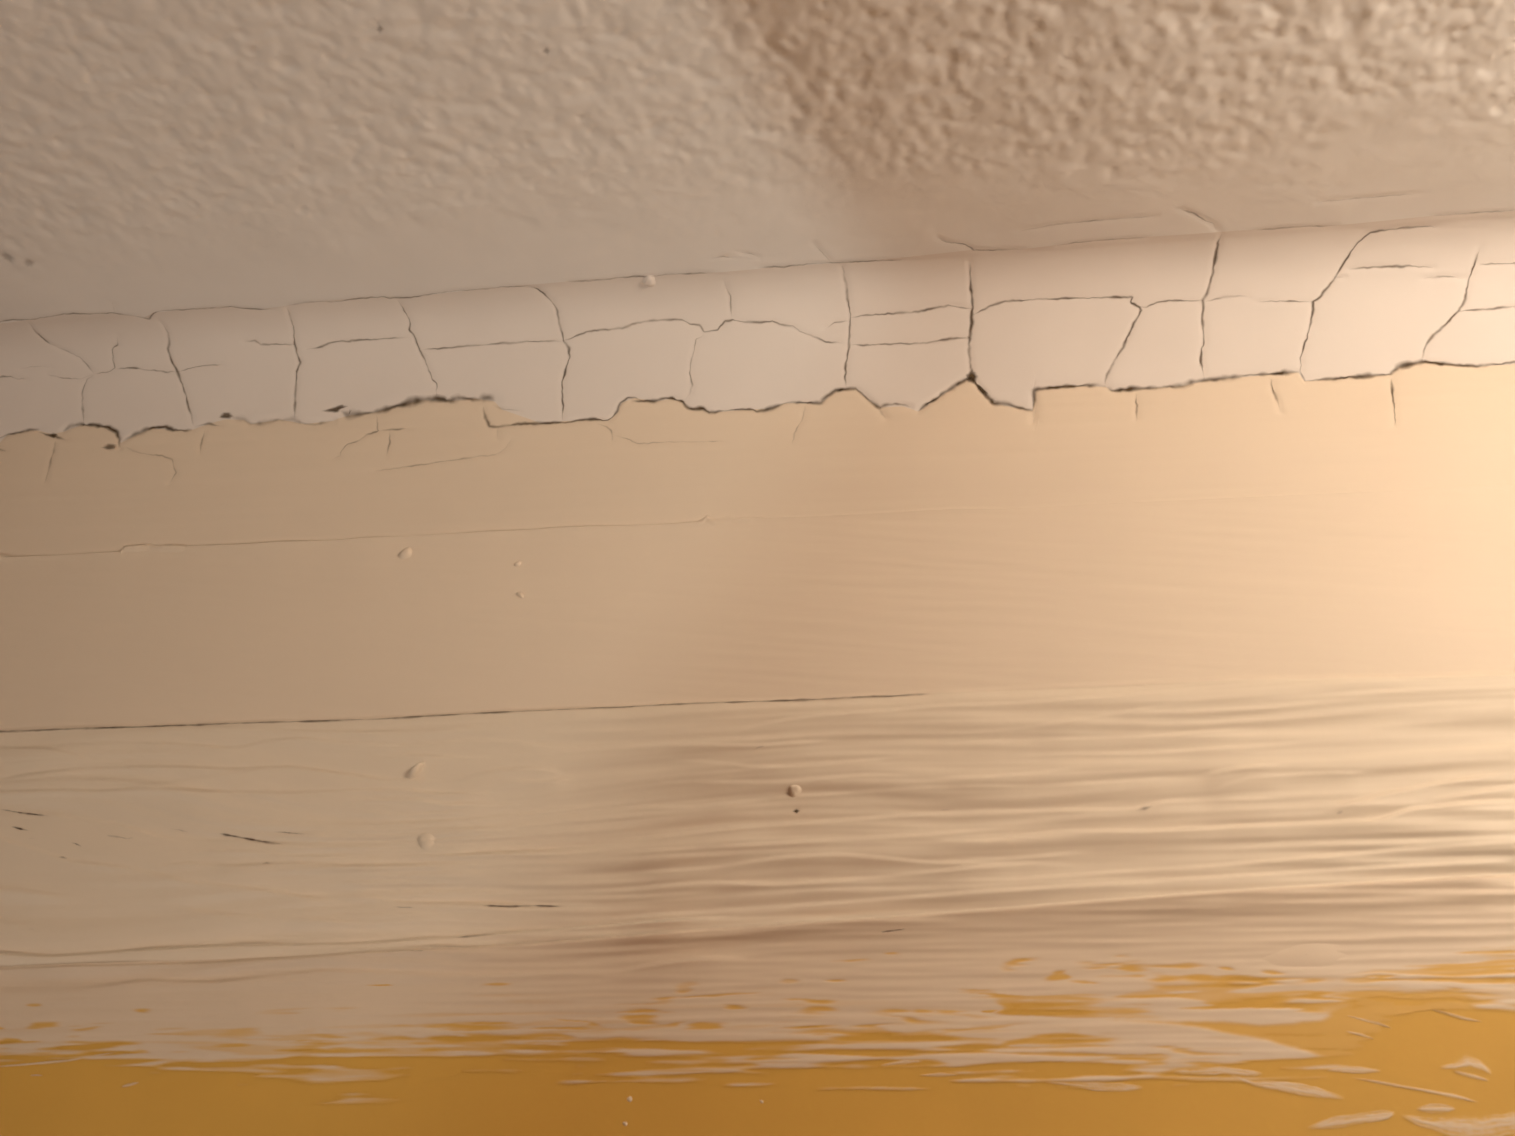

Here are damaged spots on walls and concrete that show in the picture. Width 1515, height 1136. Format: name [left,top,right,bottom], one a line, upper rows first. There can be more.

crack [11,357,190,438]
crack [358,243,994,425]
crack [924,215,1507,410]